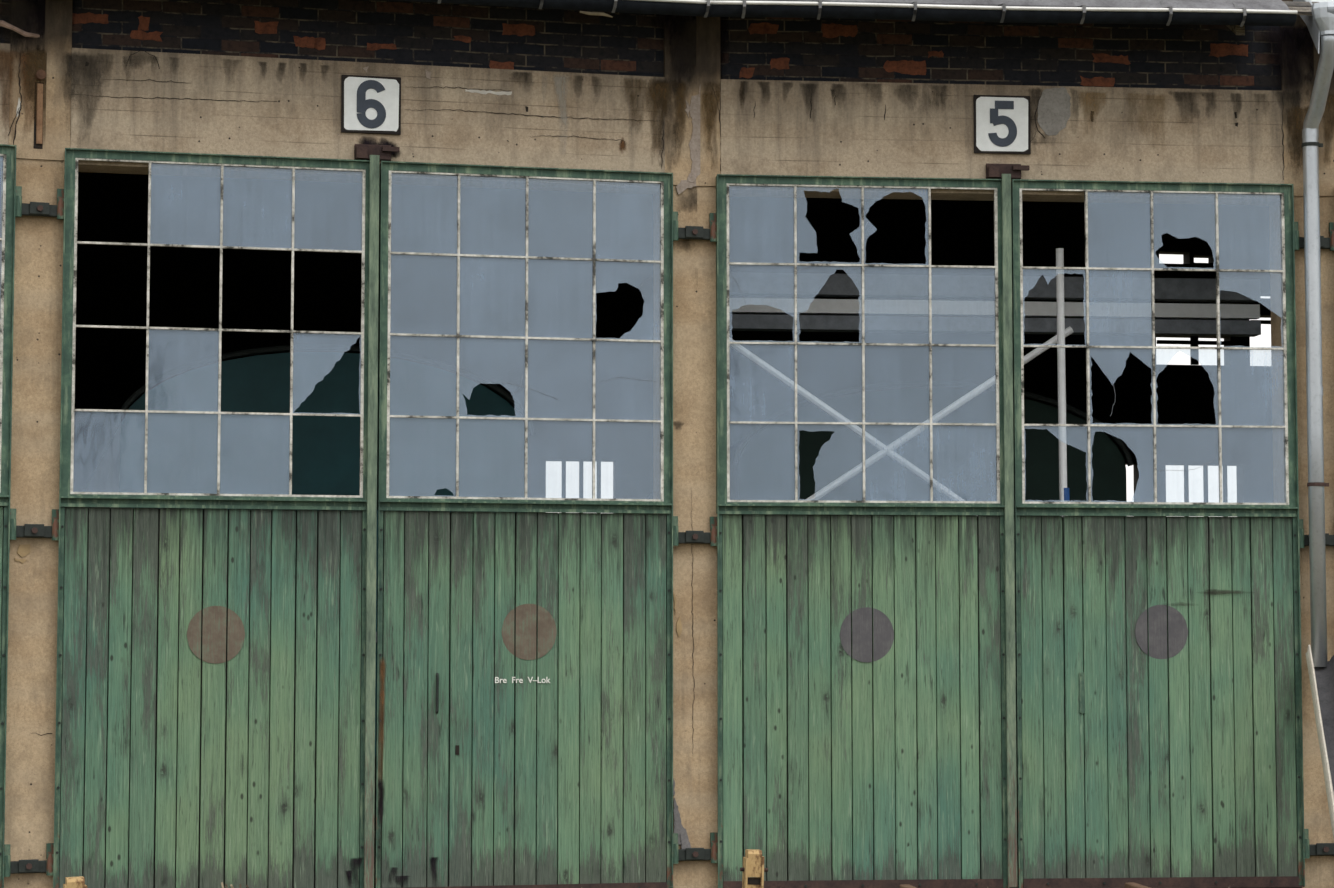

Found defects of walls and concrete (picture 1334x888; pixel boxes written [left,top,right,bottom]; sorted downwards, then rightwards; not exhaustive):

damp [65,54,110,119]
damp [626,14,697,147]
damp [703,17,727,131]
damp [1030,89,1041,132]